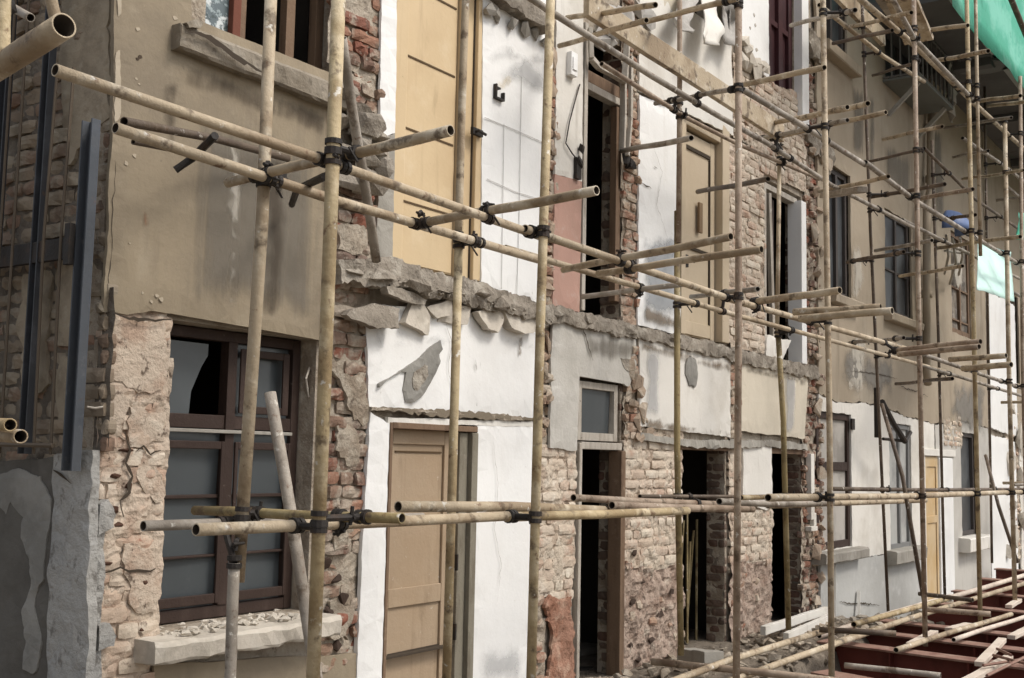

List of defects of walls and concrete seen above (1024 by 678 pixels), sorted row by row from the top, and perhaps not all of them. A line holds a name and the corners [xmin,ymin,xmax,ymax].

crack [185,29,262,73]
spalling [336,0,395,260]
spalling [729,14,836,354]
spalling [96,291,174,678]
crack [119,436,161,517]
spalling [321,529,361,672]
spalling [327,283,372,512]
spalling [417,288,578,505]
spalling [536,520,576,678]
spalling [620,339,684,499]
spalling [624,515,686,670]
spalling [797,507,826,621]